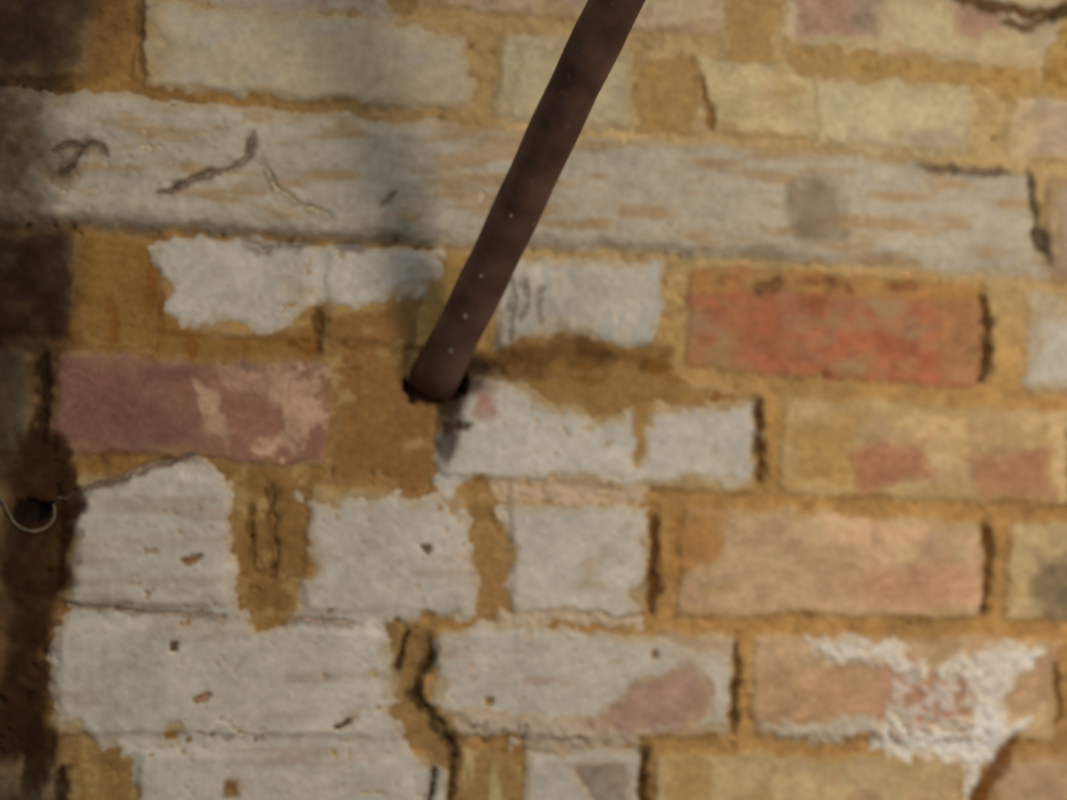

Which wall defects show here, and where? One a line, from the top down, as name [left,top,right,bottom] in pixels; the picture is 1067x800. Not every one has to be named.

damp [0,0,60,87]
peeling [153,0,478,108]
crack [958,0,1067,31]
damp [0,100,45,218]
crack [51,141,108,175]
crack [156,131,255,194]
peeling [526,17,1067,284]
damp [0,235,63,346]
peeling [0,42,765,800]
damp [0,433,86,800]
crack [395,630,457,800]
damp [760,630,1048,800]